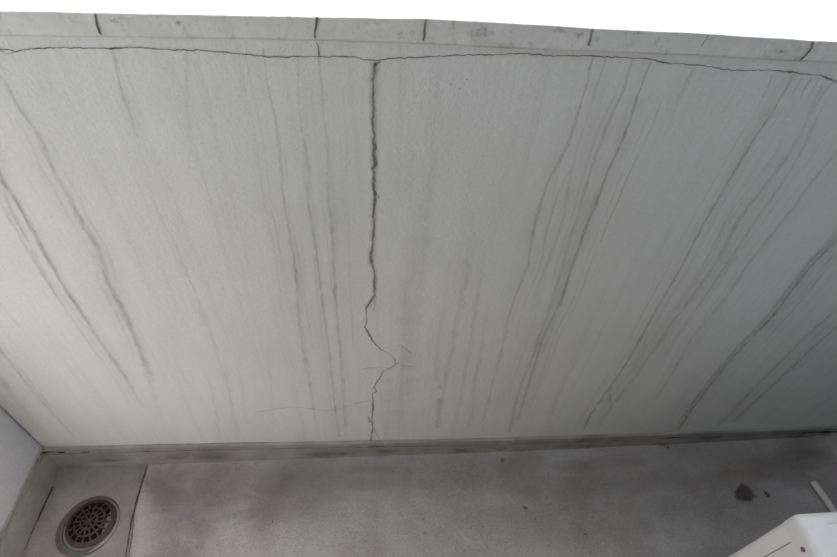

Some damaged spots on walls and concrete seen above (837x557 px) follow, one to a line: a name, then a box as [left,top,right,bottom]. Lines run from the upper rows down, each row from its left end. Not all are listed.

crack [0,0,836,351]